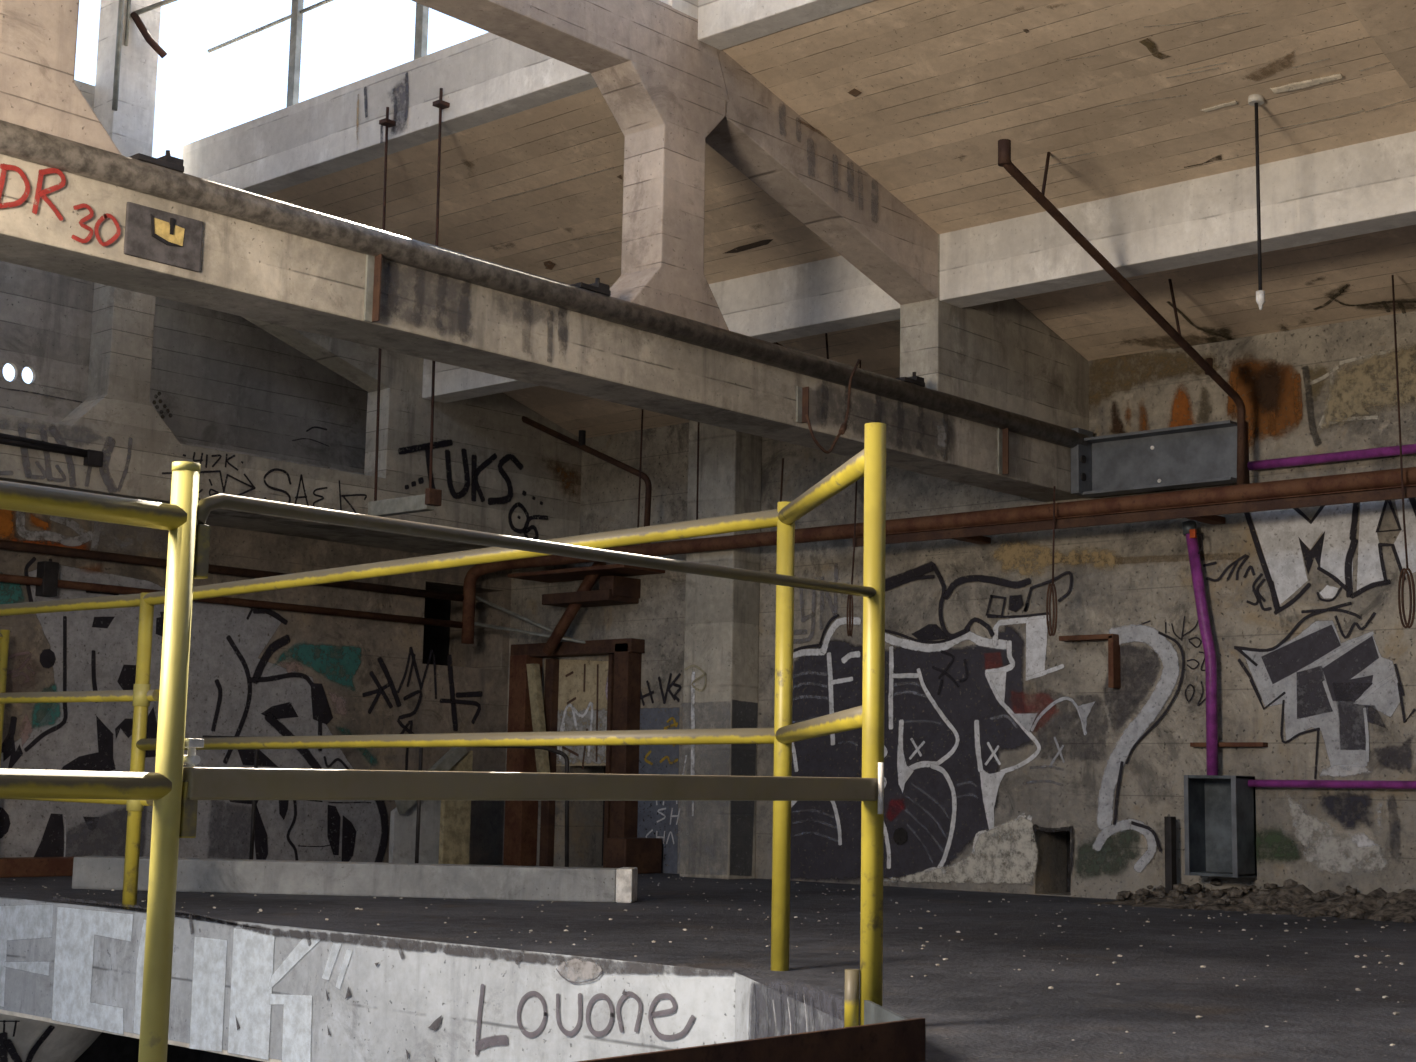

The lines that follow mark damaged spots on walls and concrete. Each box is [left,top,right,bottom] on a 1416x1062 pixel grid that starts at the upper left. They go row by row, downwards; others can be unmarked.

leakage [779,105,878,222]
leakage [382,261,471,336]
leakage [547,307,567,362]
corrosion [1111,402,1148,434]
corrosion [1169,359,1302,445]
peeling [1321,766,1370,777]
peeling [891,813,1074,887]
peeling [1288,798,1386,874]